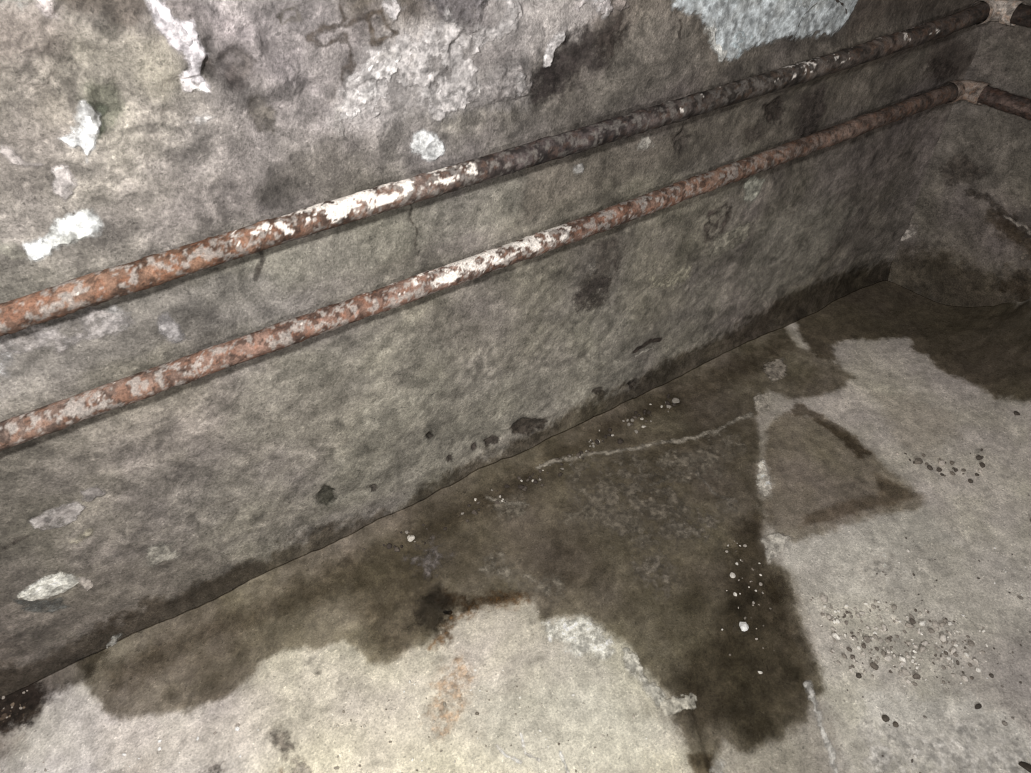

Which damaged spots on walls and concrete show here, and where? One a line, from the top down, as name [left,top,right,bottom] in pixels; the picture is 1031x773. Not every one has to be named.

peeling [148,0,256,92]
peeling [673,0,858,62]
peeling [60,101,109,155]
peeling [0,146,77,200]
peeling [0,210,102,261]
leakage [573,228,625,312]
peeling [0,306,130,360]
leakage [773,280,1031,400]
leakage [395,537,593,601]
leakage [539,394,793,716]
crack [804,681,838,773]
leakage [864,720,1031,773]